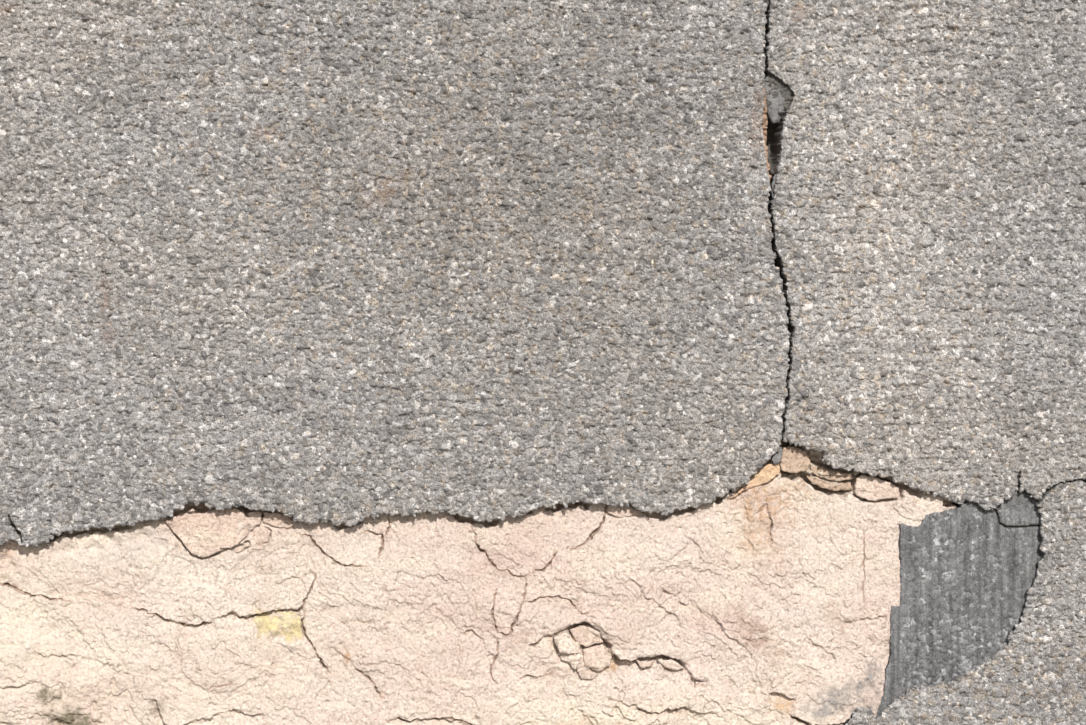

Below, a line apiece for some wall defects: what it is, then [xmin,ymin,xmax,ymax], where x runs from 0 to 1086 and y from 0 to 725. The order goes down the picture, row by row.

crack [761,0,795,441]
crack [131,517,473,725]
spalling [0,440,1048,725]
crack [470,504,608,685]
crack [606,642,630,662]
crack [635,706,686,715]